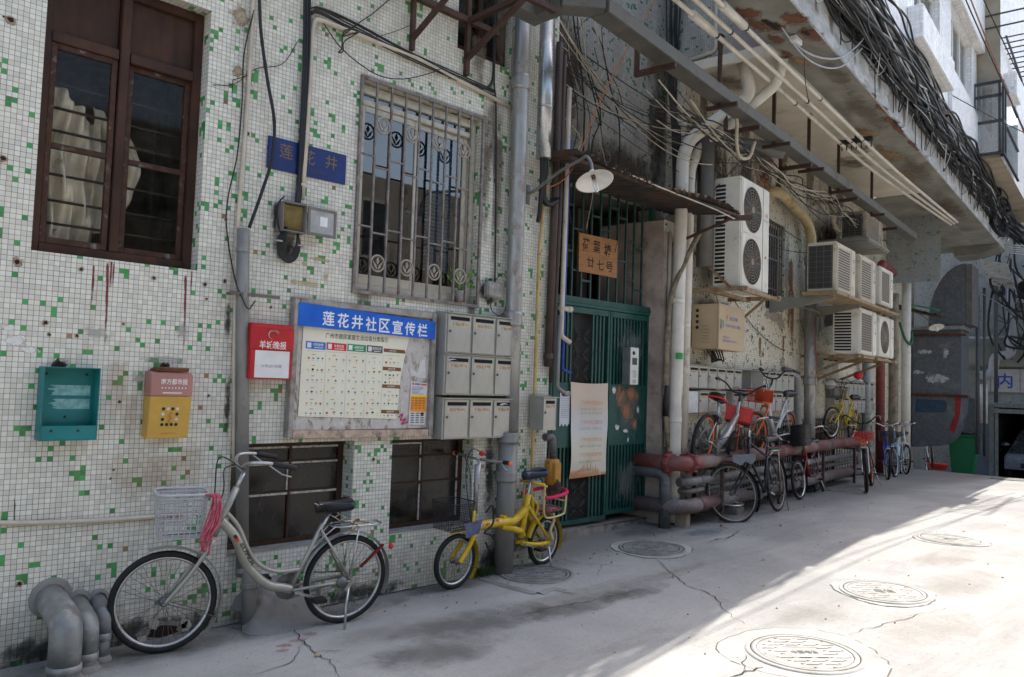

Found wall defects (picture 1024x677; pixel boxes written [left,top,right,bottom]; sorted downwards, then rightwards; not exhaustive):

rust [91,262,115,340]
rust [184,272,193,333]
peeling [913,370,950,383]
water stain [316,583,396,604]
crack [514,531,767,677]
water stain [1,639,48,669]
water stain [110,612,200,647]
crack [261,629,340,677]